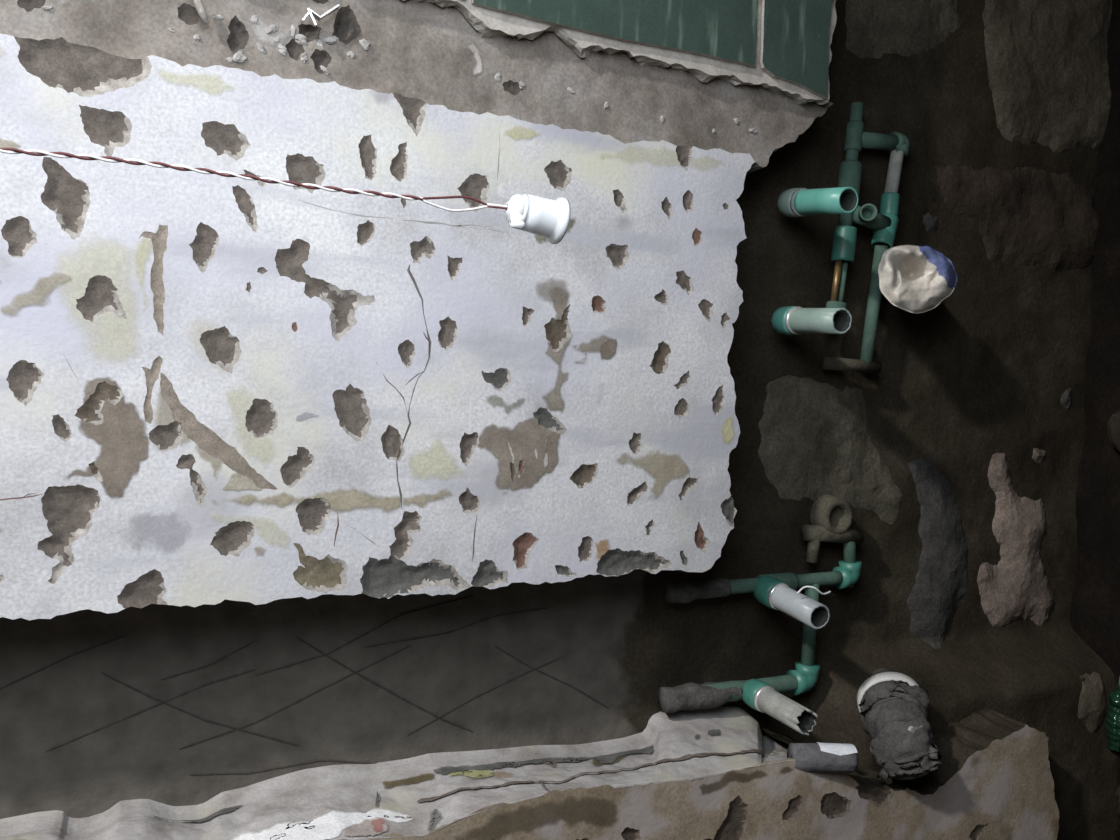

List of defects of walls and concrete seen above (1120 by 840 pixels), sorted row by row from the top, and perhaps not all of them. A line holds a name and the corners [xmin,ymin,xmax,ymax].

spalling [17,0,46,12]
spalling [177,3,200,25]
spalling [226,15,249,54]
spalling [286,0,362,74]
flaking render [14,36,152,156]
spalling [41,157,91,240]
flaking render [246,239,375,341]
crack [376,264,431,507]
peeling [38,378,208,584]
peeling [460,407,567,490]
flaking render [293,498,540,598]
flaking render [555,522,710,577]